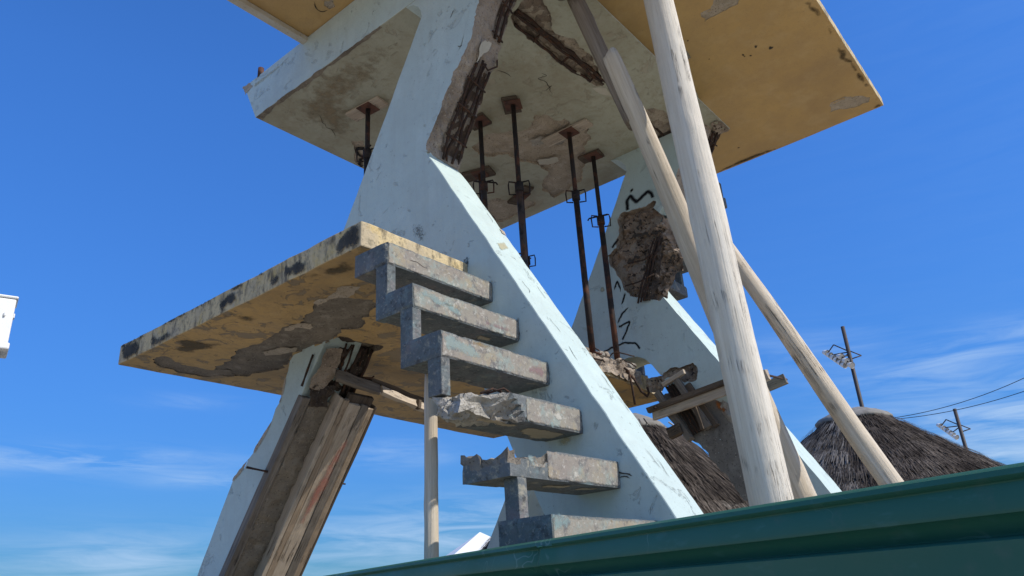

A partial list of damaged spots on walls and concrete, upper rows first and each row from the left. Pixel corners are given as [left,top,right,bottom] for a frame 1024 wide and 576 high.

spalling [420,0,606,195]
spalling [704,119,729,155]
spalling [672,155,687,203]
spalling [611,206,684,304]
damp [219,292,235,309]
damp [177,341,212,352]
spalling [585,347,697,405]
spalling [680,409,702,435]